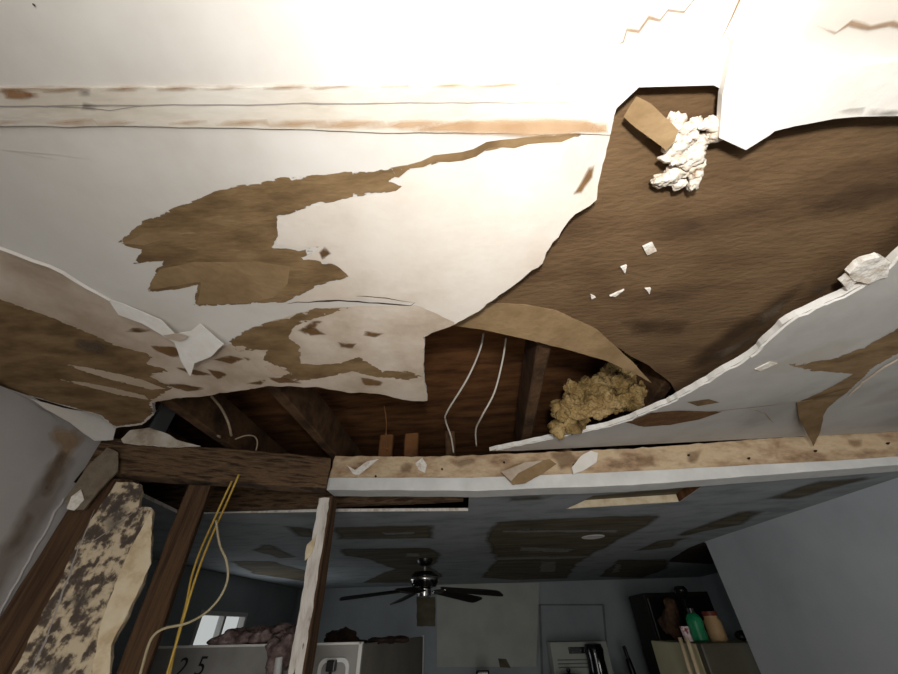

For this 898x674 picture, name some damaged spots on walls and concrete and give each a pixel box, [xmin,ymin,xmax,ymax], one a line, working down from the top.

spalling [650,111,723,191]
peeling [0,134,610,403]
peeling [643,242,657,255]
spalling [838,252,892,290]
peeling [775,478,866,499]
peeling [483,516,658,580]
peeling [601,511,760,578]
peeling [234,497,441,674]